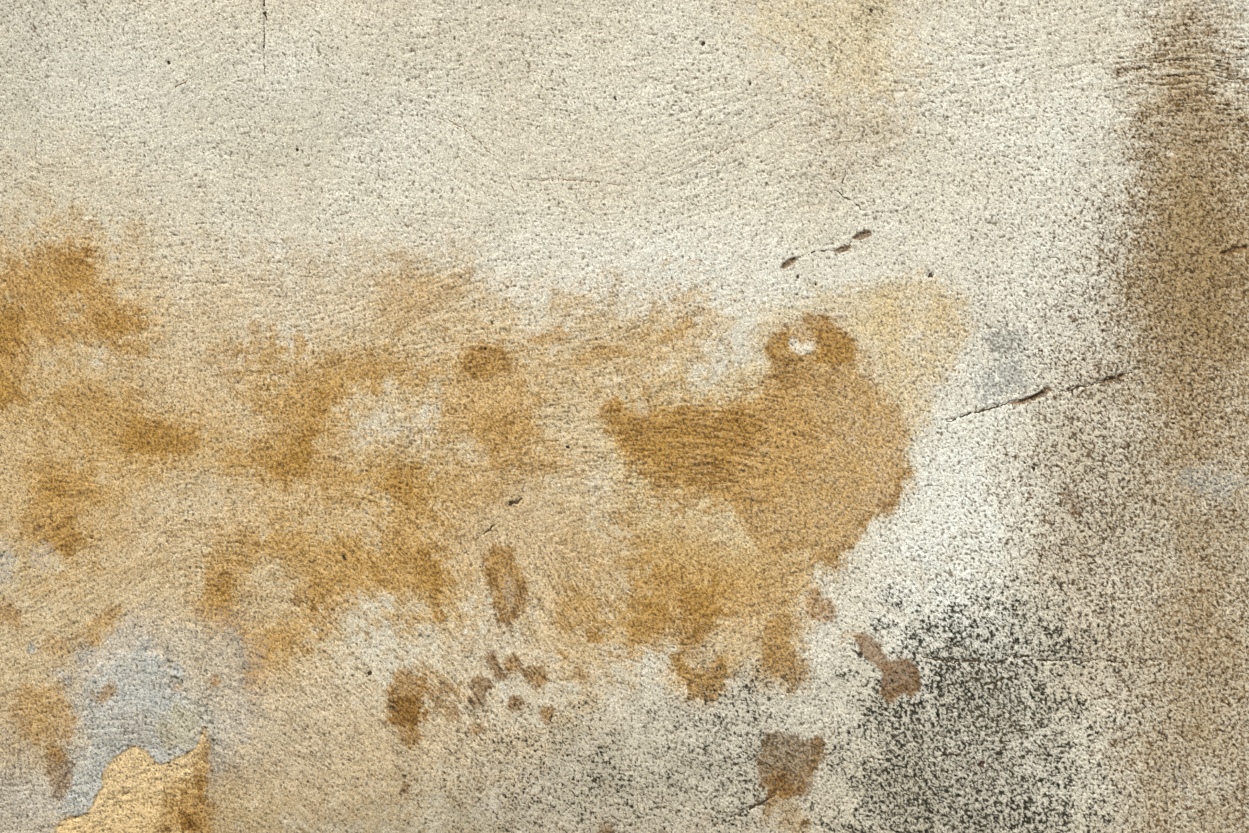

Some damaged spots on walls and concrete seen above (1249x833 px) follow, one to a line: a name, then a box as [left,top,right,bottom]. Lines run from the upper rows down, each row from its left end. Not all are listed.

crack [780,174,874,270]
damp [0,165,1154,833]
crack [946,372,1131,422]
peeling [0,561,308,833]